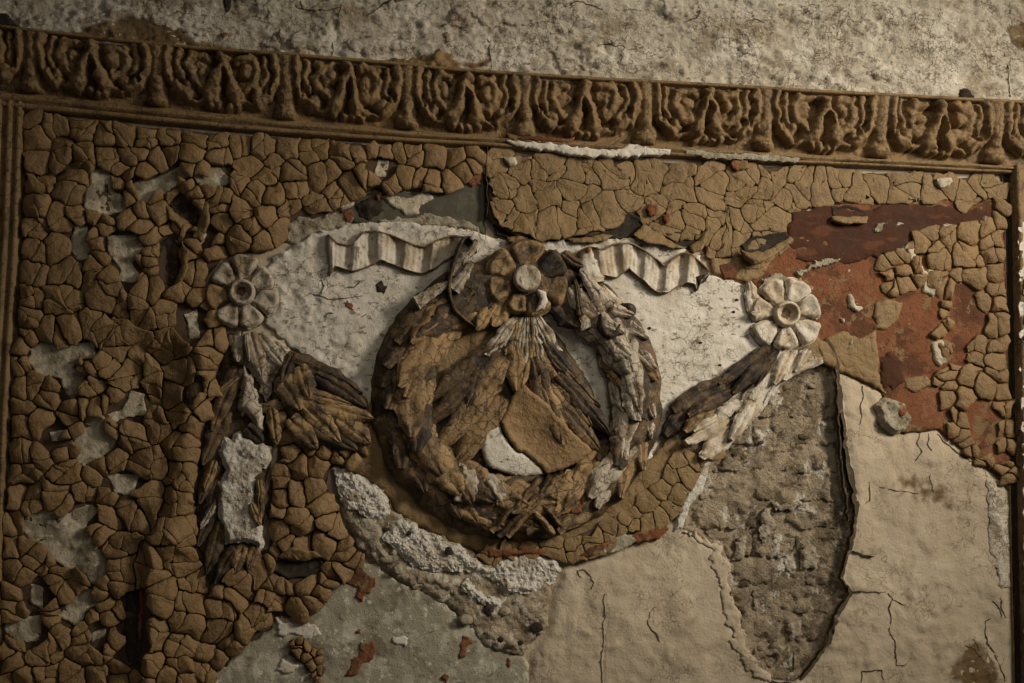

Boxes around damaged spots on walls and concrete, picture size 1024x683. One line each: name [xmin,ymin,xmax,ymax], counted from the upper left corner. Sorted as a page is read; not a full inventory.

peeling [24,504,110,626]
peeling [84,166,231,286]
crack [0,109,492,683]
flaking render [200,465,563,683]
flaking render [453,427,544,503]
flaking render [264,159,762,460]
peeling [503,140,671,167]
crack [474,449,725,589]
crack [487,147,1020,486]
flaking render [673,359,853,682]
crack [752,338,934,683]
crack [965,598,1006,682]